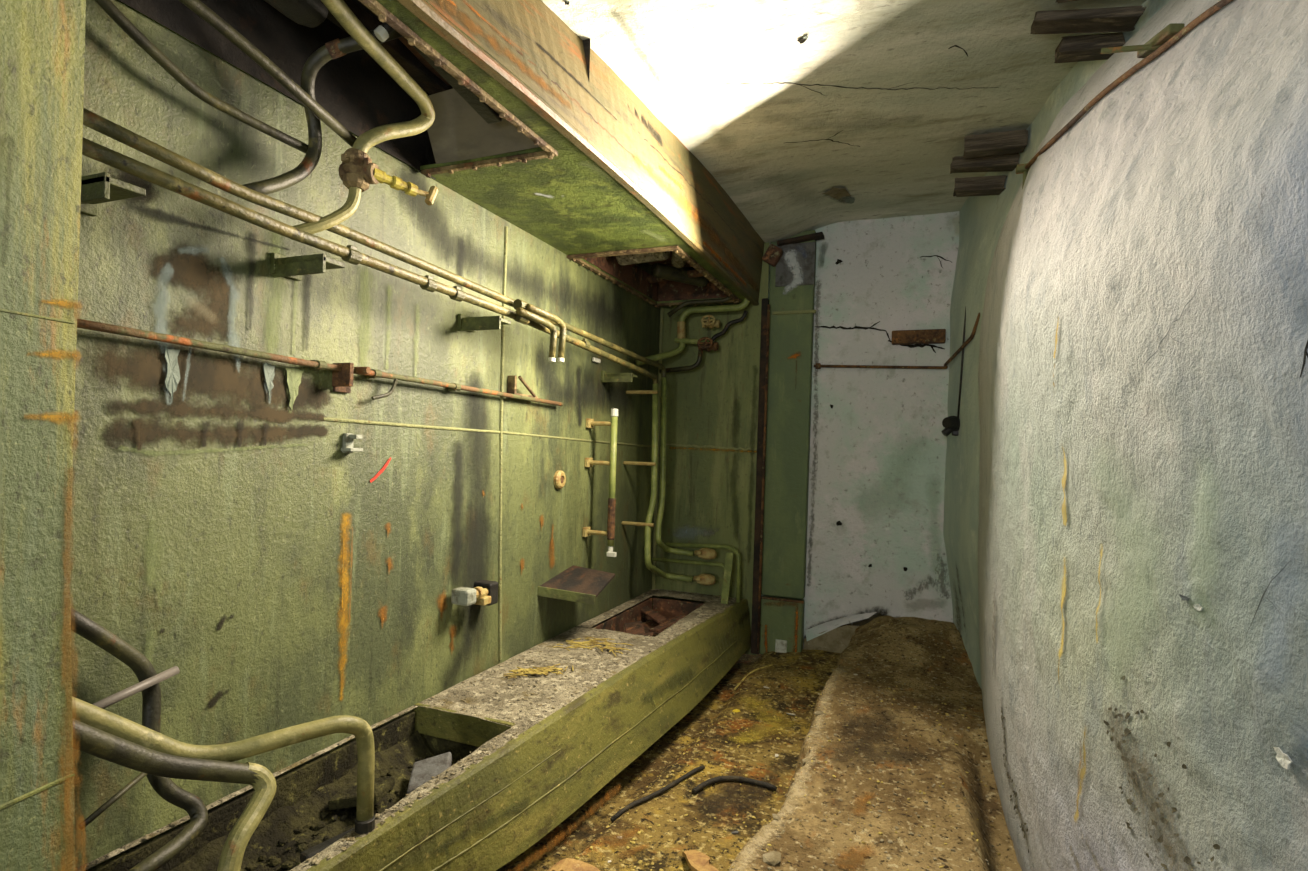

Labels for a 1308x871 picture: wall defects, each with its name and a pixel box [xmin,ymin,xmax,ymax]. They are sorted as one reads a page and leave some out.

corrosion [435,0,570,108]
leakage [133,206,290,328]
corrosion [634,156,758,290]
leakage [86,274,330,456]
corrosion [338,514,353,700]
mould [1104,705,1220,871]